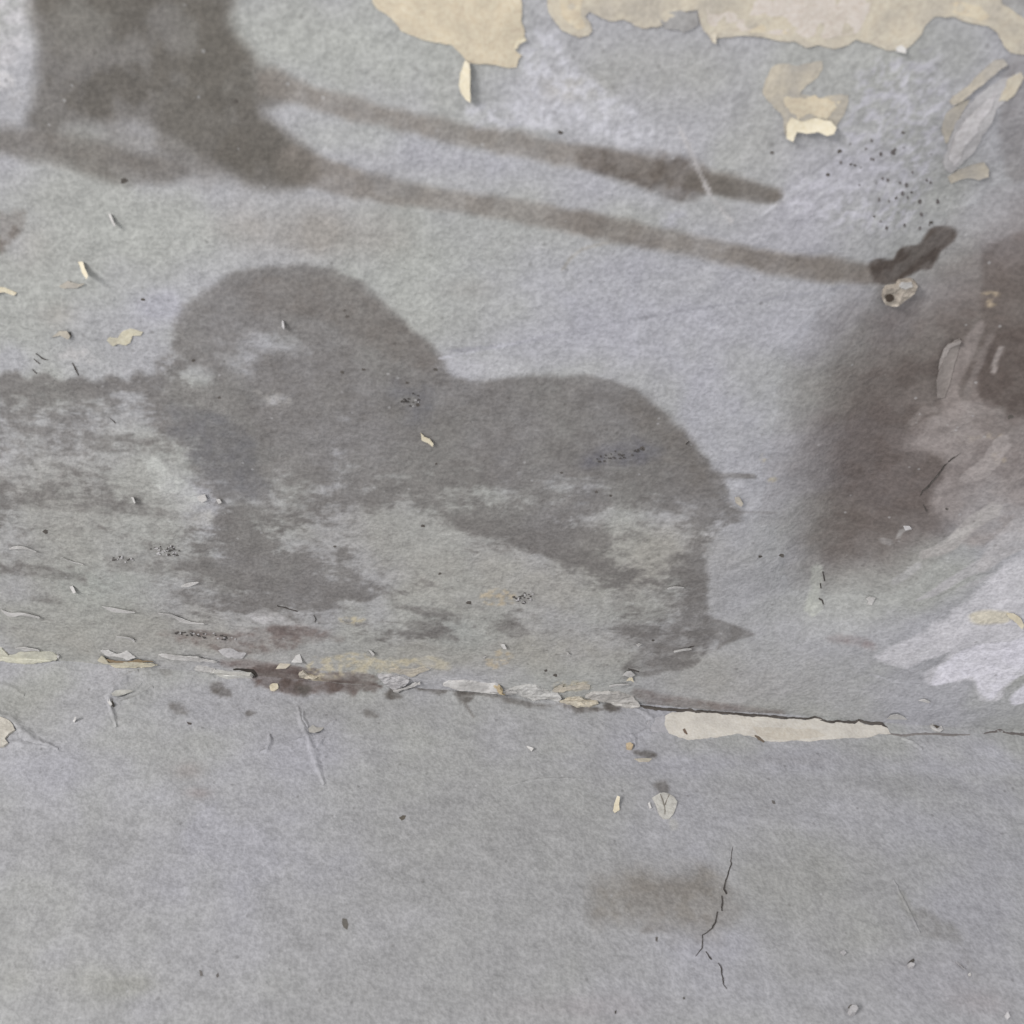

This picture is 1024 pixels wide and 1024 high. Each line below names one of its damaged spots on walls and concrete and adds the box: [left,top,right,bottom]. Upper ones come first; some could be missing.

peeling [372,0,527,103]
peeling [547,0,1024,184]
leakage [0,0,1024,700]
peeling [0,647,60,664]
peeling [97,650,157,727]
peeling [218,648,246,659]
peeling [276,654,302,669]
peeling [647,711,891,742]
crack [640,705,1024,737]
crack [696,847,733,989]